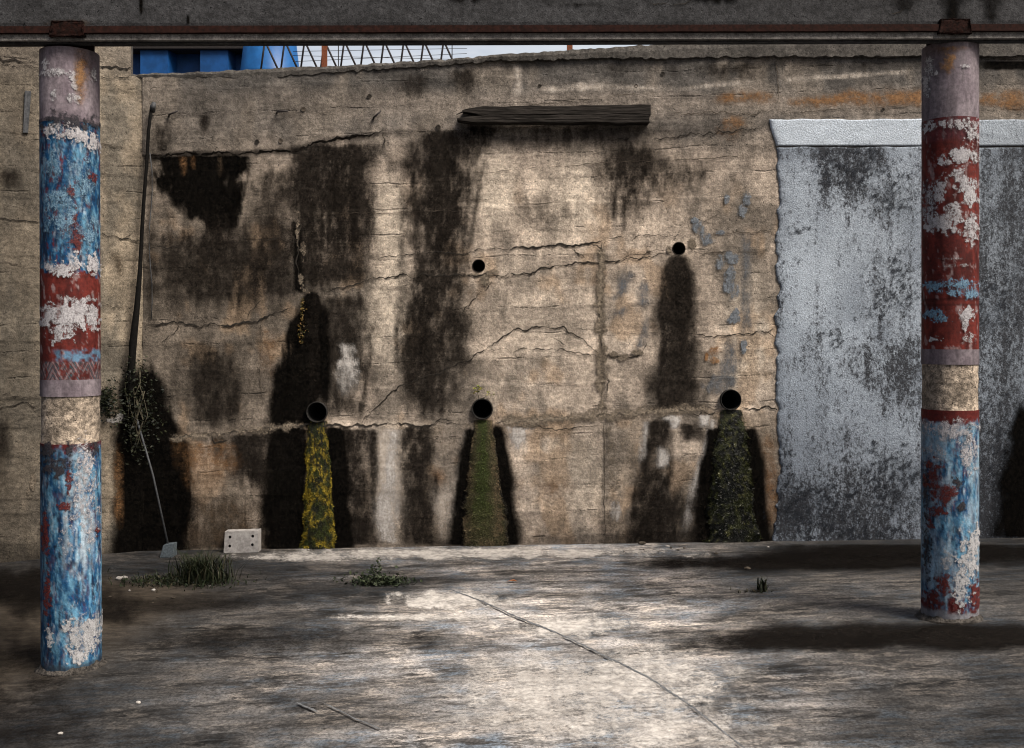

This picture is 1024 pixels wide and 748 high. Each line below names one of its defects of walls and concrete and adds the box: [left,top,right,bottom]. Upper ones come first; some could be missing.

peeling [38,58,102,278]
crack [101,130,387,158]
peeling [920,117,981,247]
peeling [39,295,102,346]
peeling [39,395,123,666]
leakage [112,126,493,553]
crack [102,214,776,533]
leakage [493,425,526,545]
leakage [611,255,720,544]
leakage [624,427,921,570]
peeling [920,364,981,615]
crack [442,586,744,748]